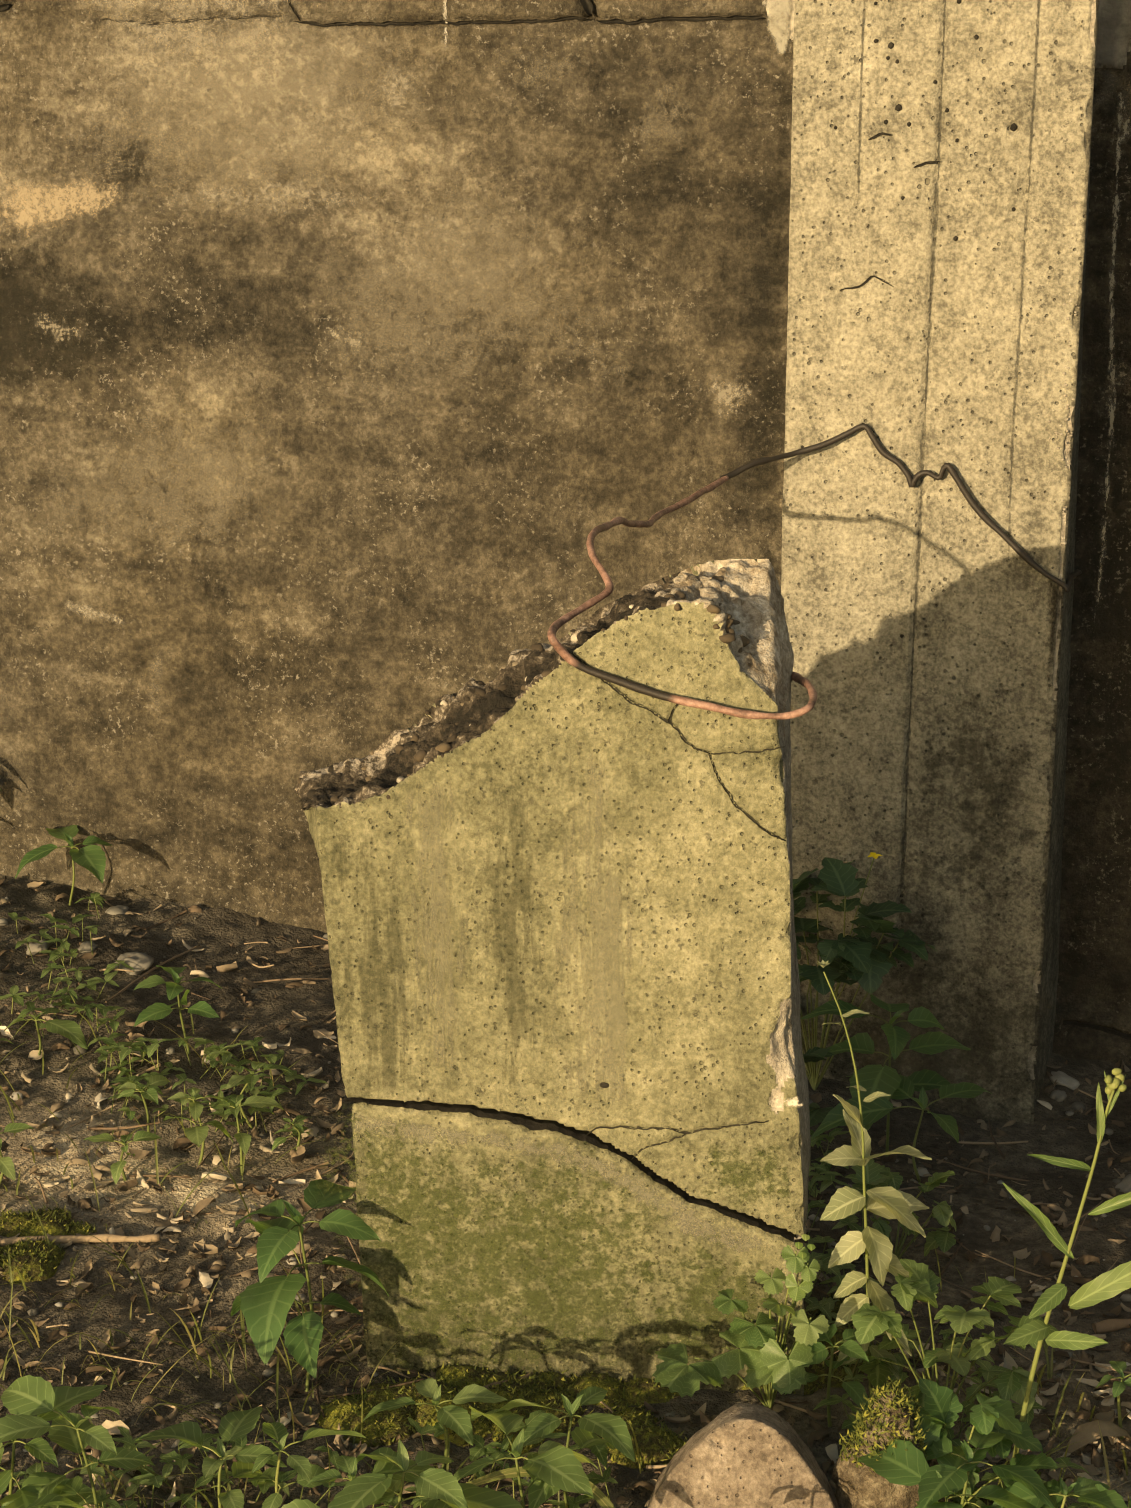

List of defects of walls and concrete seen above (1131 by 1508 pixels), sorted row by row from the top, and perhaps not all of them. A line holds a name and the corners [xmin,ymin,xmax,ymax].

damp [83,0,292,58]
damp [381,65,414,112]
damp [1076,70,1130,622]
spalling [294,559,794,810]
crack [568,650,786,841]
crack [1063,1020,1131,1040]
crack [343,1097,808,1244]